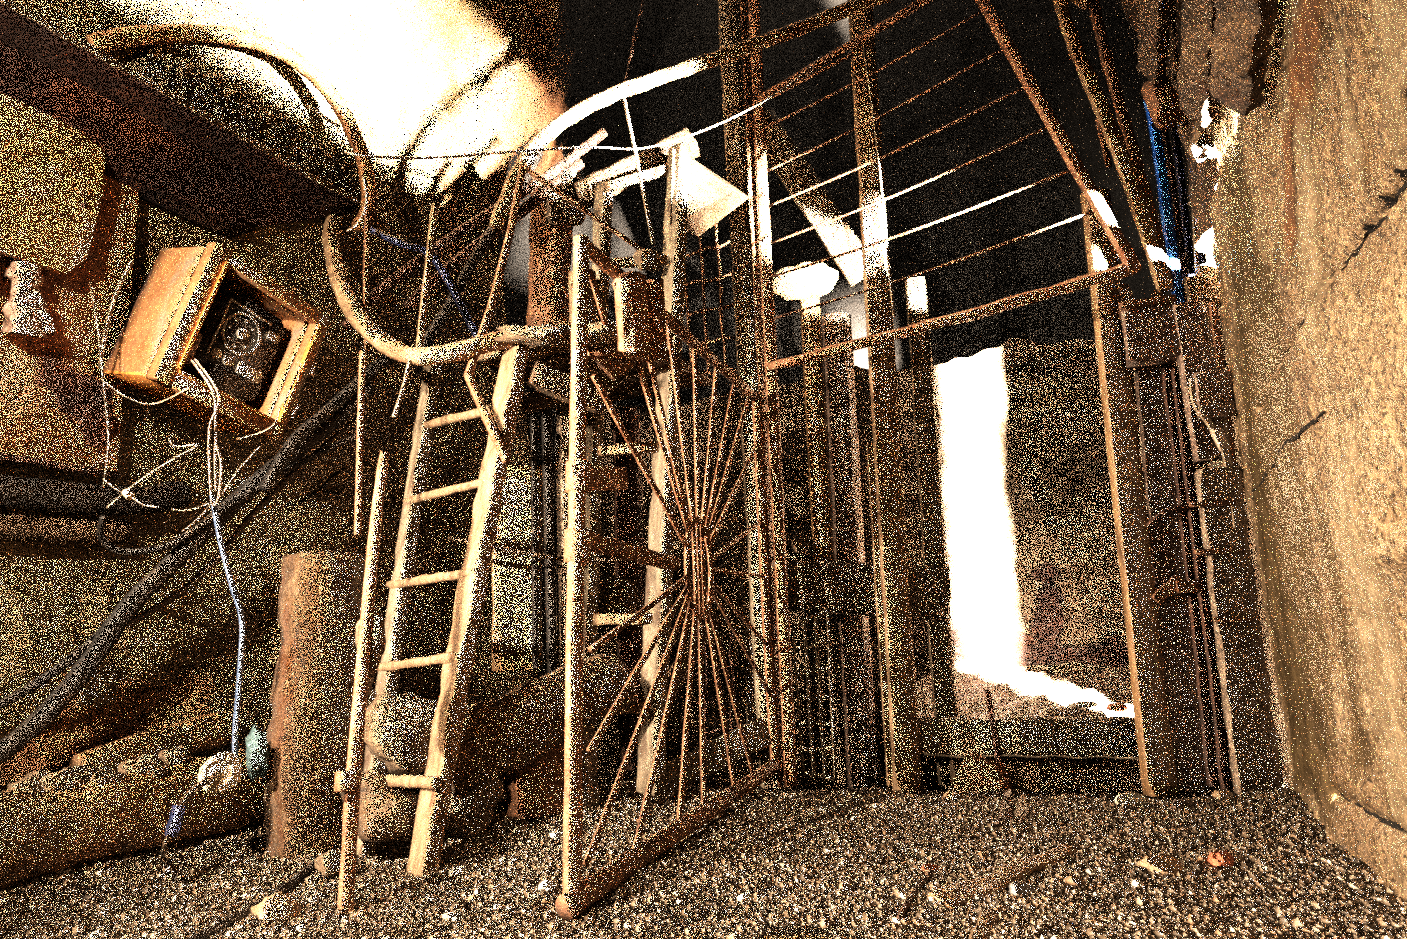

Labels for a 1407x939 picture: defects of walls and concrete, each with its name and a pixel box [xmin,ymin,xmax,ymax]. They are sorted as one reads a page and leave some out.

rust [0,175,139,479]
crack [1283,168,1407,356]
crack [1252,410,1325,500]
crack [1340,793,1407,835]